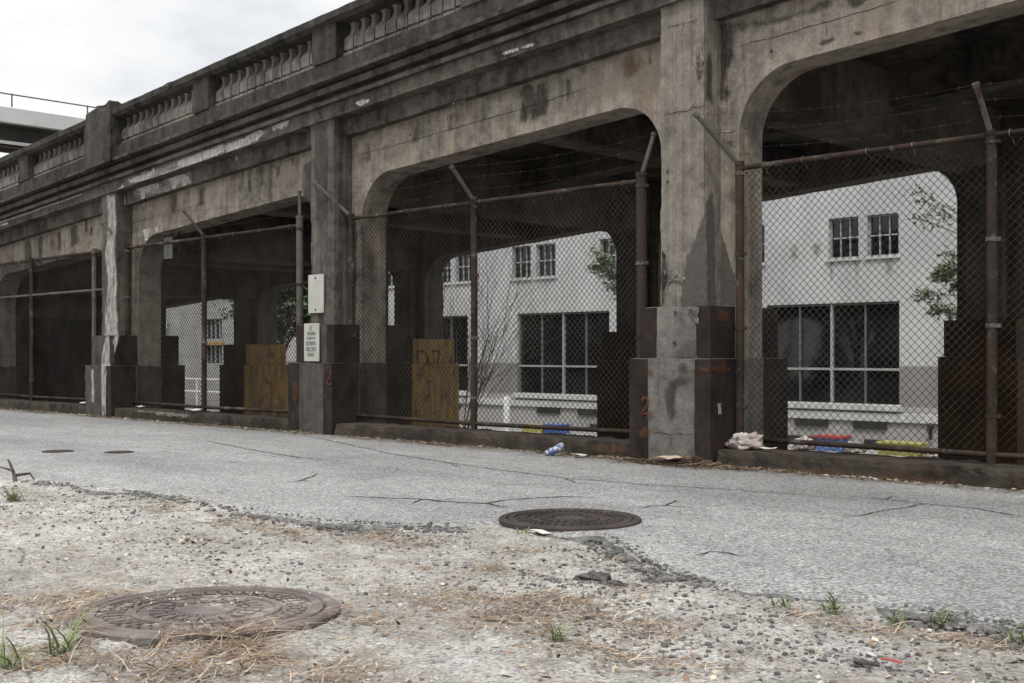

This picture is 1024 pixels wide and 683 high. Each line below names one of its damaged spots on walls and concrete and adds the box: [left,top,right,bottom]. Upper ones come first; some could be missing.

damp [521,84,547,121]
crack [664,0,899,115]
damp [91,120,289,415]
damp [681,194,735,306]
damp [665,340,697,418]
crack [206,430,1018,517]